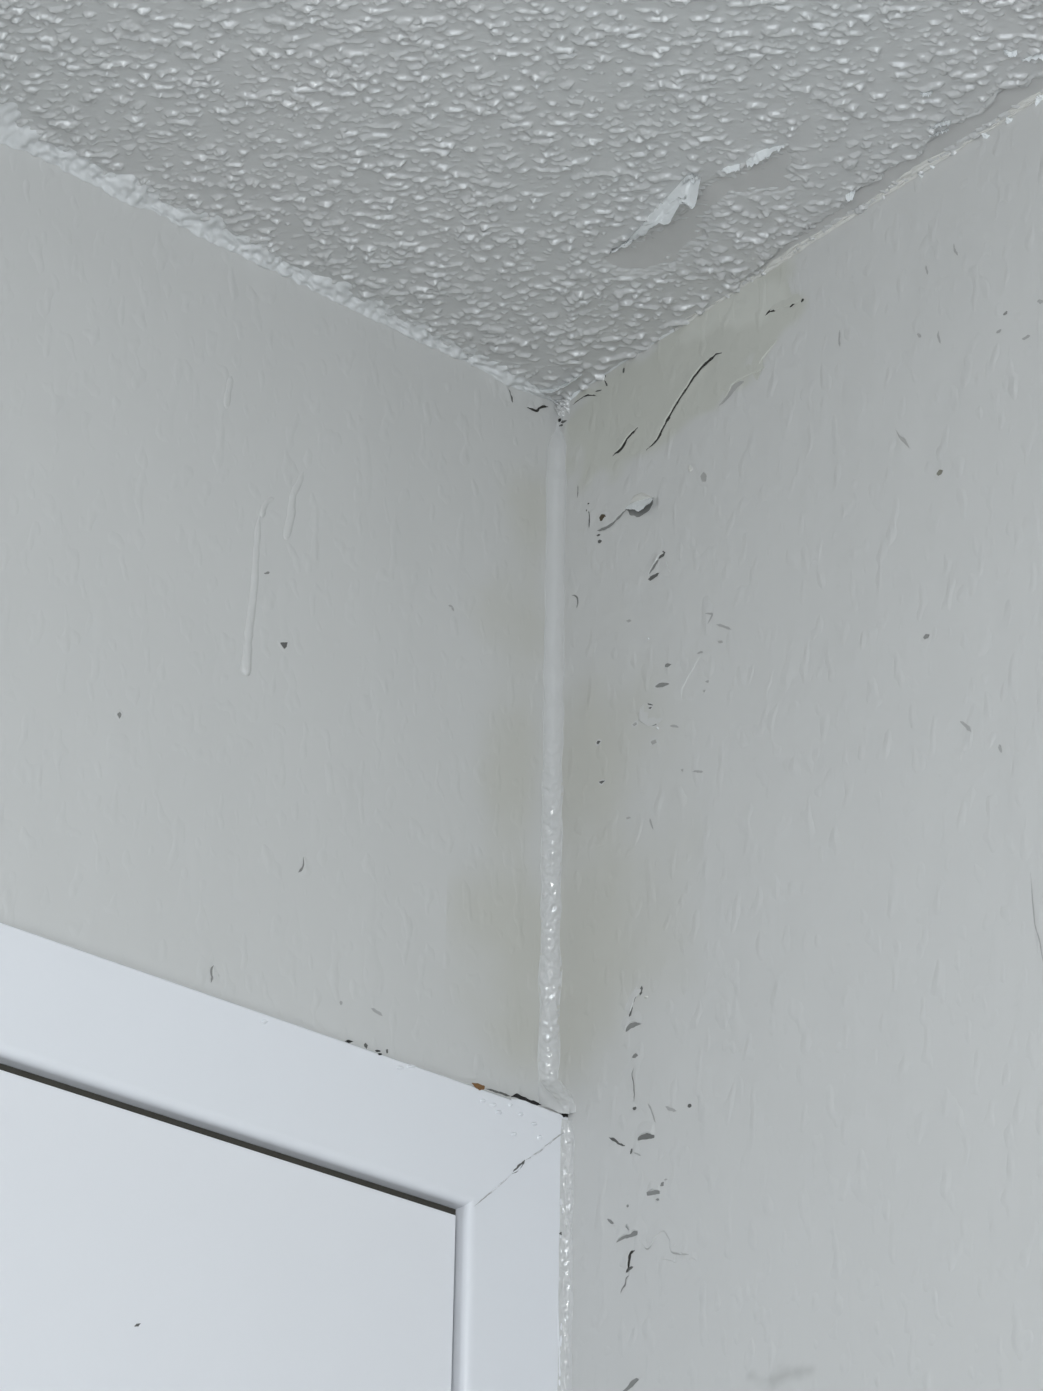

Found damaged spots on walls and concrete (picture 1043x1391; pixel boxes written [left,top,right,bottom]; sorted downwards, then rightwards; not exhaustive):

peeling [721,145,785,173]
peeling [610,174,701,254]
crack [614,350,722,458]
peeling [595,492,653,546]